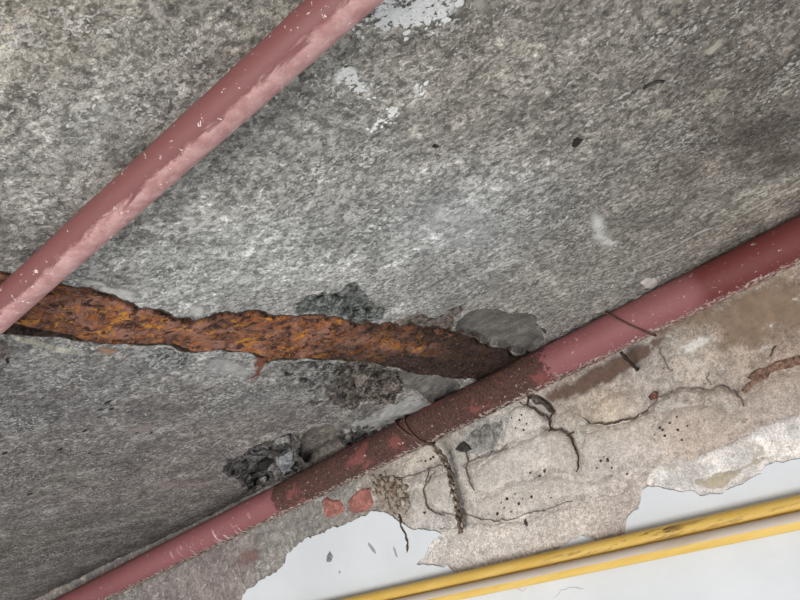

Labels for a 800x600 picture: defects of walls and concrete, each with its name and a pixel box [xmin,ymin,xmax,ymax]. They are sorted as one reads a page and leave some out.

peeling [352,0,464,41]
spalling [2,323,110,345]
rust [251,357,267,380]
peeling [59,264,800,600]
crack [520,346,744,472]
crack [462,444,507,490]
crack [379,465,573,522]